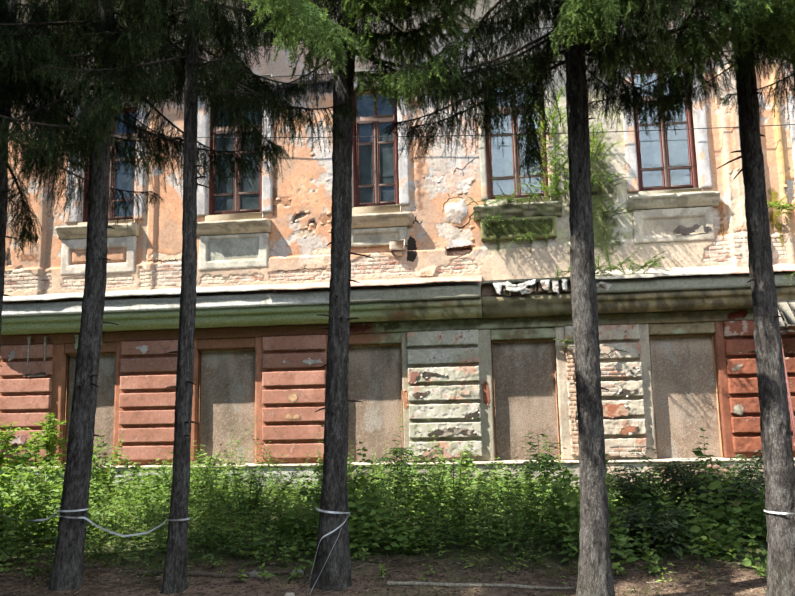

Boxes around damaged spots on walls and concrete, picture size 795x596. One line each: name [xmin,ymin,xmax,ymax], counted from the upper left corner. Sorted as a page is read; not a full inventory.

peeling [304,124,333,186]
flaking render [291,210,332,233]
flaking render [436,223,475,249]
flaking render [771,232,790,259]
flaking render [4,249,52,293]
flaking render [62,277,85,291]
flaking render [106,253,182,288]
flaking render [351,253,478,277]
spalling [504,280,571,296]
peeling [402,371,448,409]
peeling [428,381,490,439]
flaking render [600,365,646,457]